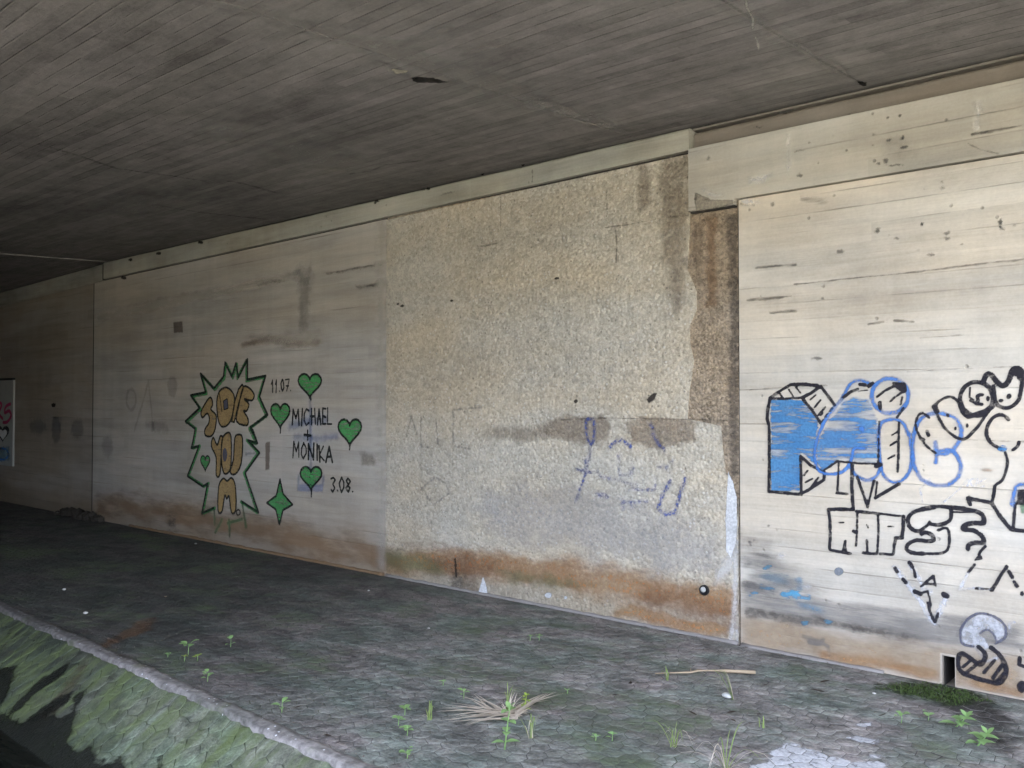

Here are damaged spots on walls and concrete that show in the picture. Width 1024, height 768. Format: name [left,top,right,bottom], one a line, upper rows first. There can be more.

spalling [392,69,446,83]
corrosion [386,552,733,633]